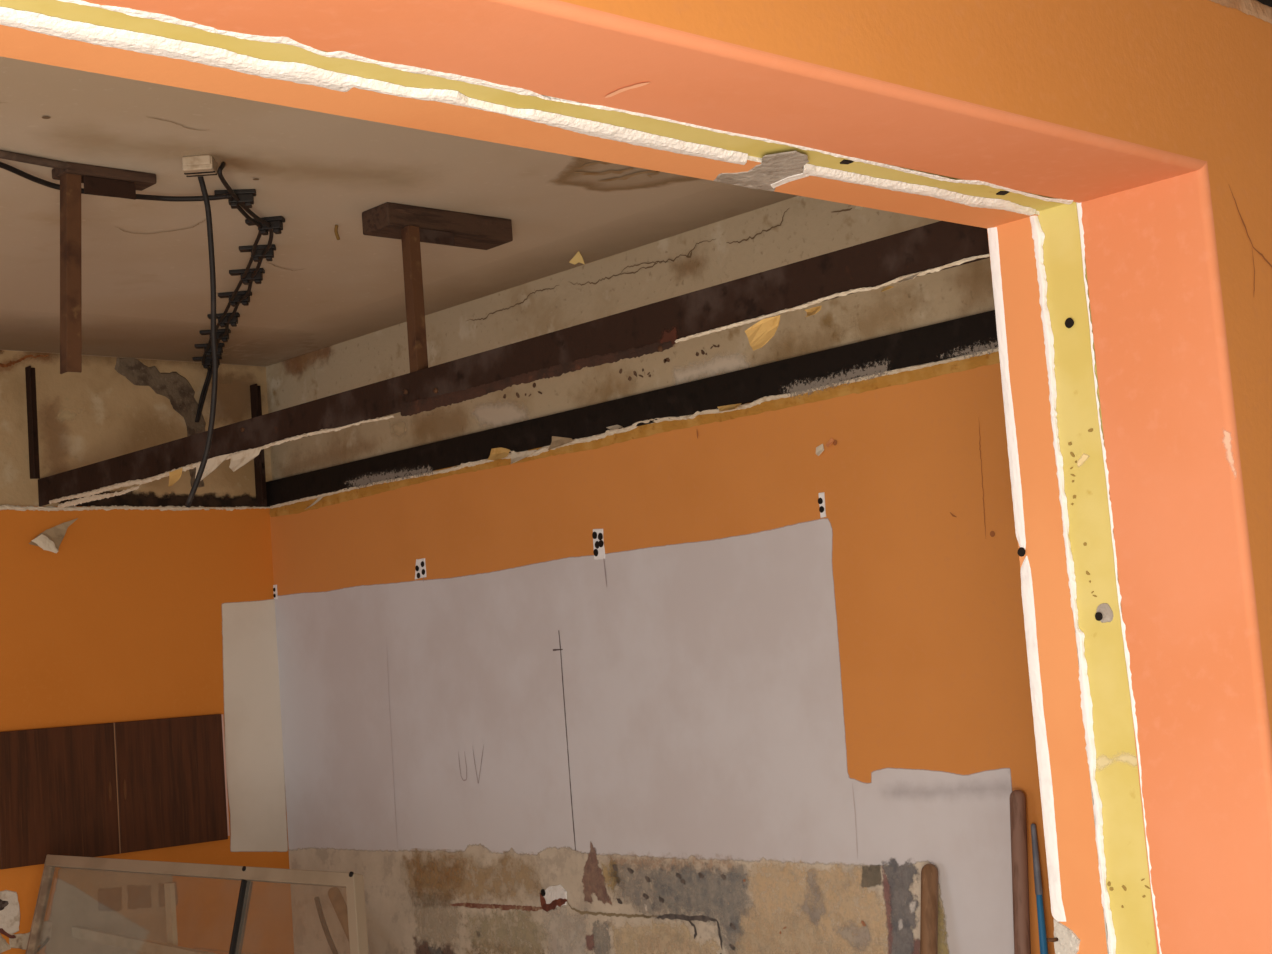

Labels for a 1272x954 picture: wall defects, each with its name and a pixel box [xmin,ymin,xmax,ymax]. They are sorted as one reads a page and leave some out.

flaking render [0,0,1073,204]
water stain [560,158,682,190]
peeling [570,251,585,265]
crack [467,208,789,321]
corrosion [400,327,677,416]
peeling [488,436,574,464]
flaking render [713,151,1116,954]
flaking render [1076,202,1162,954]
flaking render [289,842,931,954]